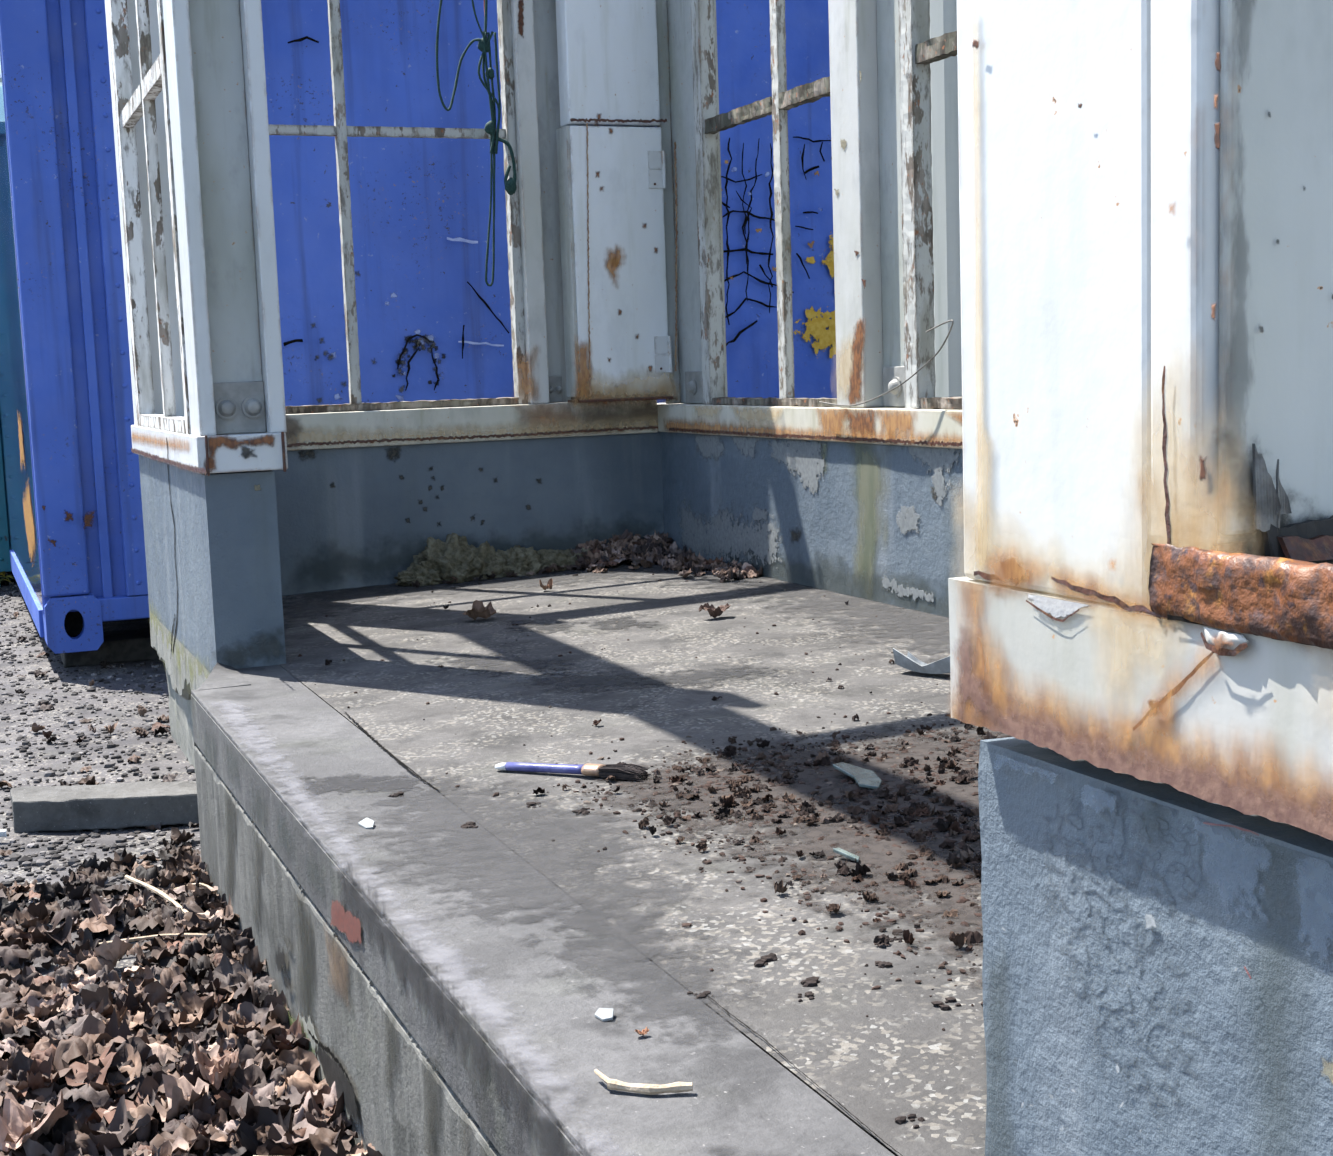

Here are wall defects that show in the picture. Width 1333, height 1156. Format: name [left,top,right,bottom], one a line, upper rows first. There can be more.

rust [131,319,963,475]
peeling [695,434,825,495]
peeling [906,446,960,507]
peeling [677,499,782,569]
peeling [896,506,920,534]
peeling [882,575,934,603]
rust [957,583,1333,841]